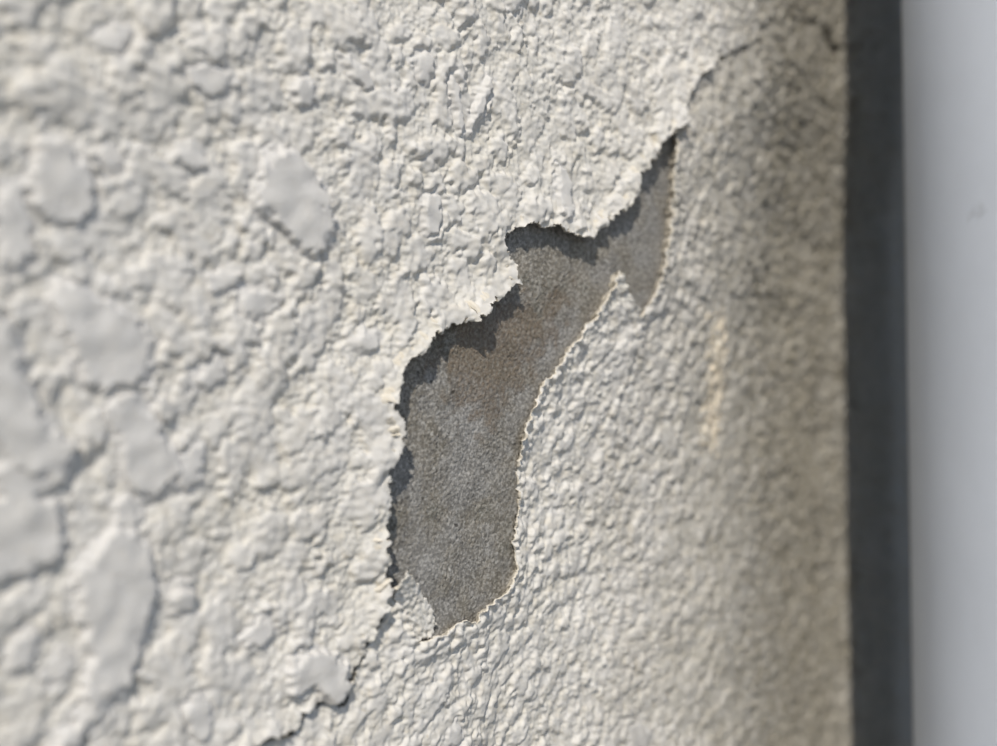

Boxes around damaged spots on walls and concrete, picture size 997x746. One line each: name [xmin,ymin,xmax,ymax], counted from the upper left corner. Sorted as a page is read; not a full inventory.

crack [688,15,876,101]
peeling [367,109,691,658]